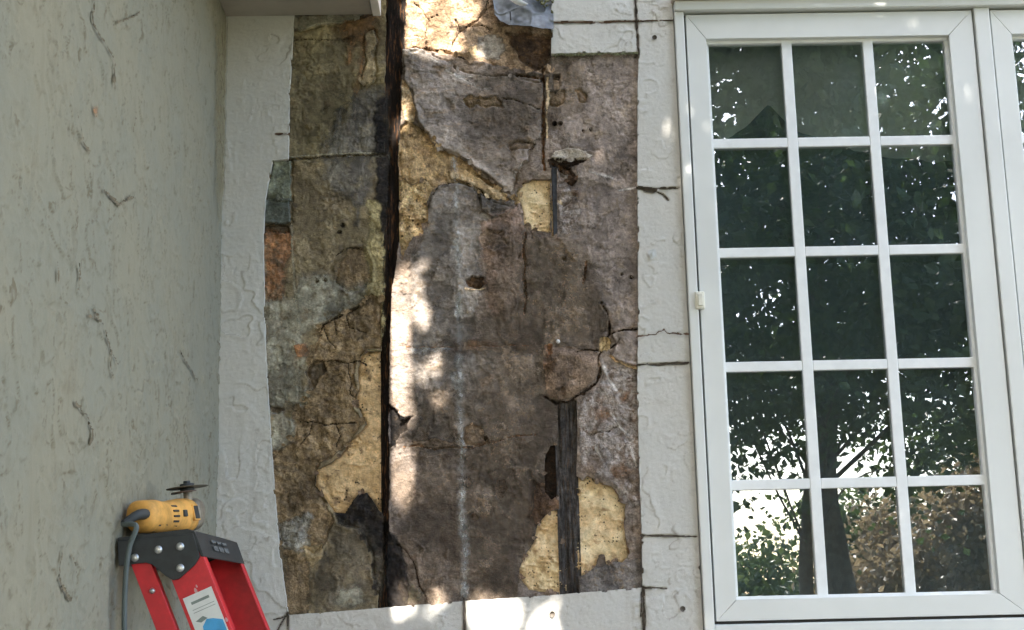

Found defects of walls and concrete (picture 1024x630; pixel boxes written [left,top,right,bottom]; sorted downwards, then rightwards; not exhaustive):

peeling [294,14,363,30]
peeling [359,30,377,86]
peeling [398,0,593,250]
crack [636,187,678,201]
spalling [265,222,289,233]
spalling [466,275,487,289]
crack [544,306,689,406]
peeling [603,331,640,366]
spalling [270,294,385,550]
spalling [388,404,413,448]
spalling [532,442,557,540]